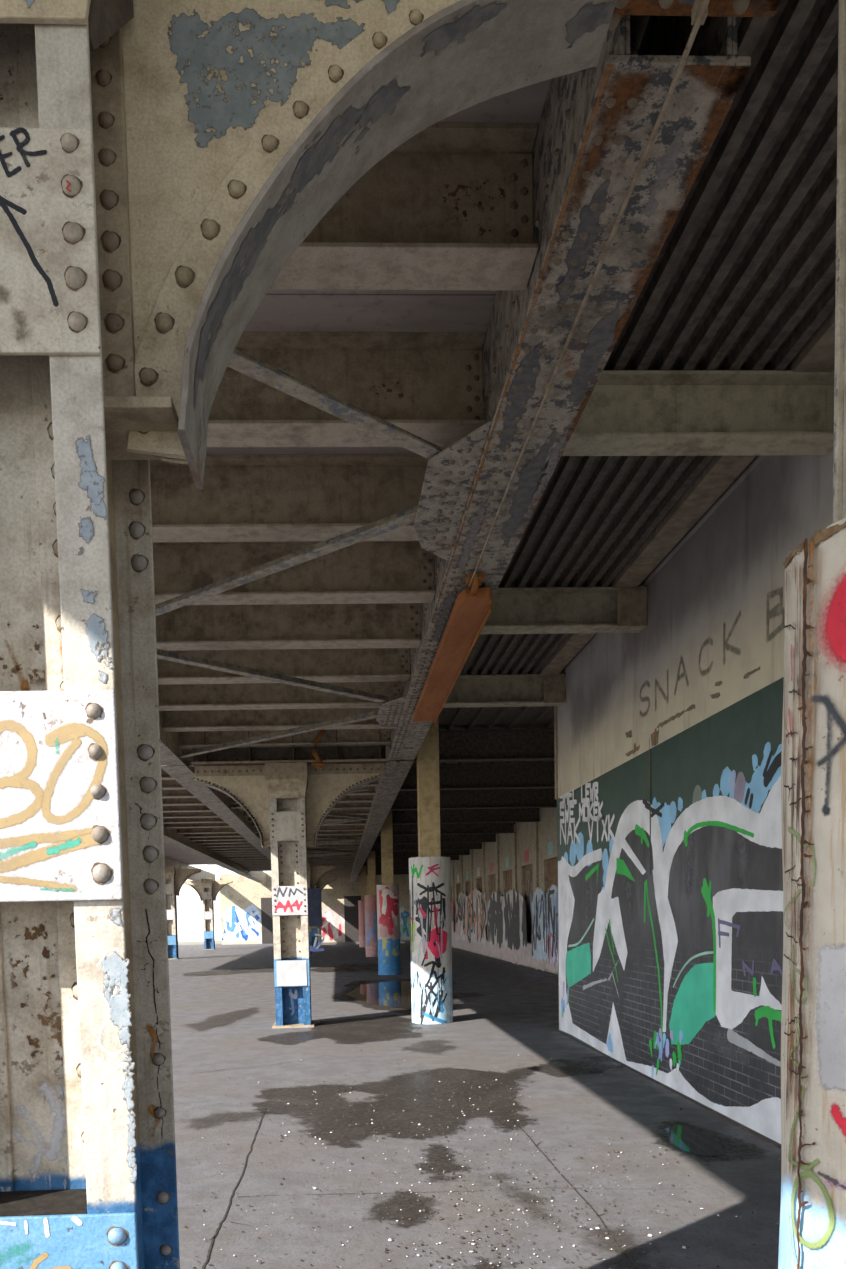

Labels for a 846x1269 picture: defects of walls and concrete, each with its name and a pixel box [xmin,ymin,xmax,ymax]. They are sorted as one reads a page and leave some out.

peeling [167,0,365,148]
corrosion [609,65,750,352]
corrosion [432,64,649,622]
peeling [75,434,108,555]
peeling [80,588,114,683]
corrosion [9,919,63,1064]
peeling [102,951,137,1183]
crack [135,803,311,1150]
crack [202,1099,270,1269]
leakage [370,1191,437,1228]
leakage [184,963,624,1182]
leakage [653,1122,768,1162]